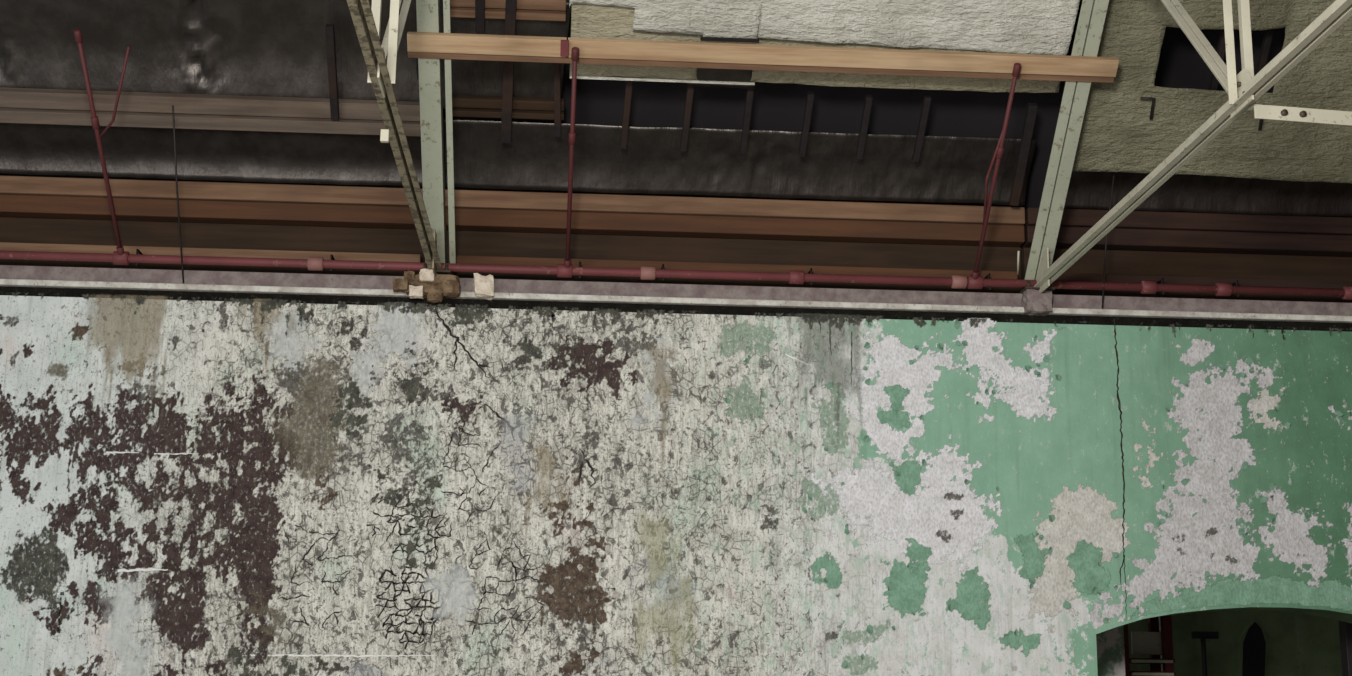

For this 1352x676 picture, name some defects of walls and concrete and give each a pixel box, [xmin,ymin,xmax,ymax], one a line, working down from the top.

crack [282,311,544,649]
flaking render [530,500,619,676]
flaking render [549,332,638,411]
peeling [802,318,1062,582]
crack [1114,319,1127,616]
peeling [1004,338,1352,640]